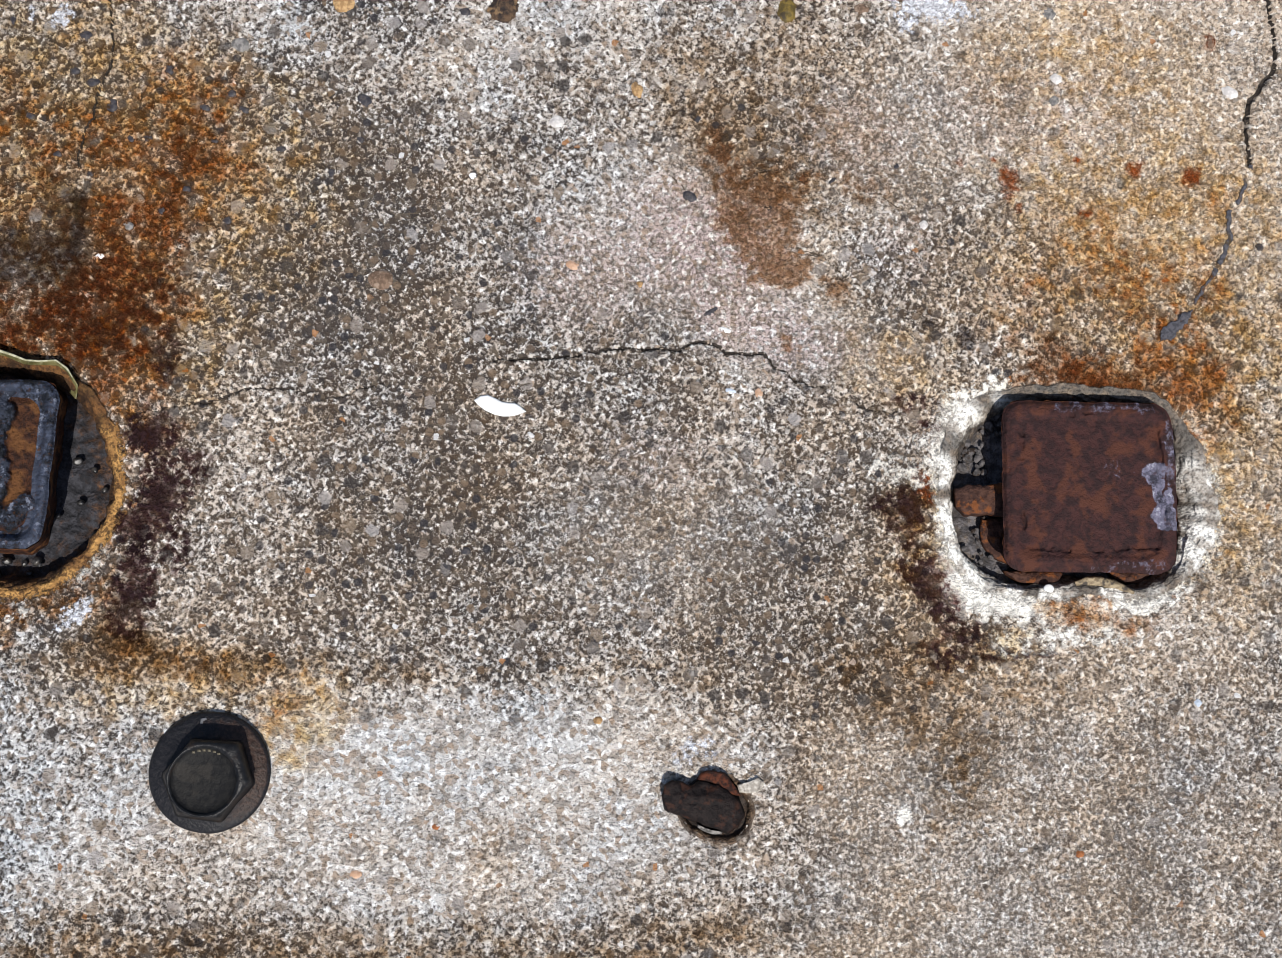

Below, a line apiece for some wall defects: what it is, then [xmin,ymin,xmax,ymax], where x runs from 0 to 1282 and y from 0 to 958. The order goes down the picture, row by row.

crack [1159,0,1277,342]
rust [106,415,207,643]
crack [136,385,375,414]
crack [492,340,824,388]
crack [856,403,897,414]
spalling [932,381,1224,607]